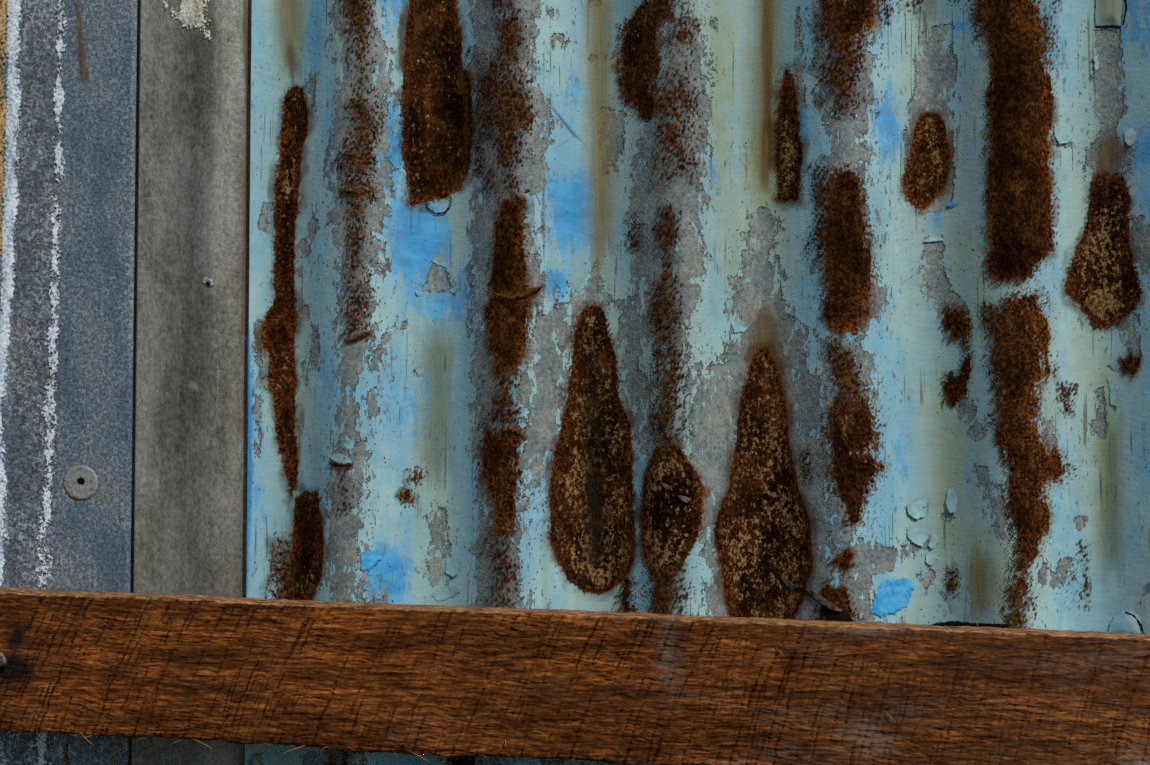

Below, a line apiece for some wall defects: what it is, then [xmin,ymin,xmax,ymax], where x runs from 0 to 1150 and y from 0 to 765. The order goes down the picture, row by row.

corrosion [256,85,355,600]
peeling [295,0,411,603]
corrosion [330,0,540,608]
corrosion [439,756,482,765]
peeling [415,0,939,623]
corrosion [544,0,924,622]
corrosion [901,108,954,211]
peeling [901,13,976,344]
peeling [941,486,958,522]
peeling [957,396,988,441]
peeling [967,462,1011,541]
corrosion [936,0,1146,628]